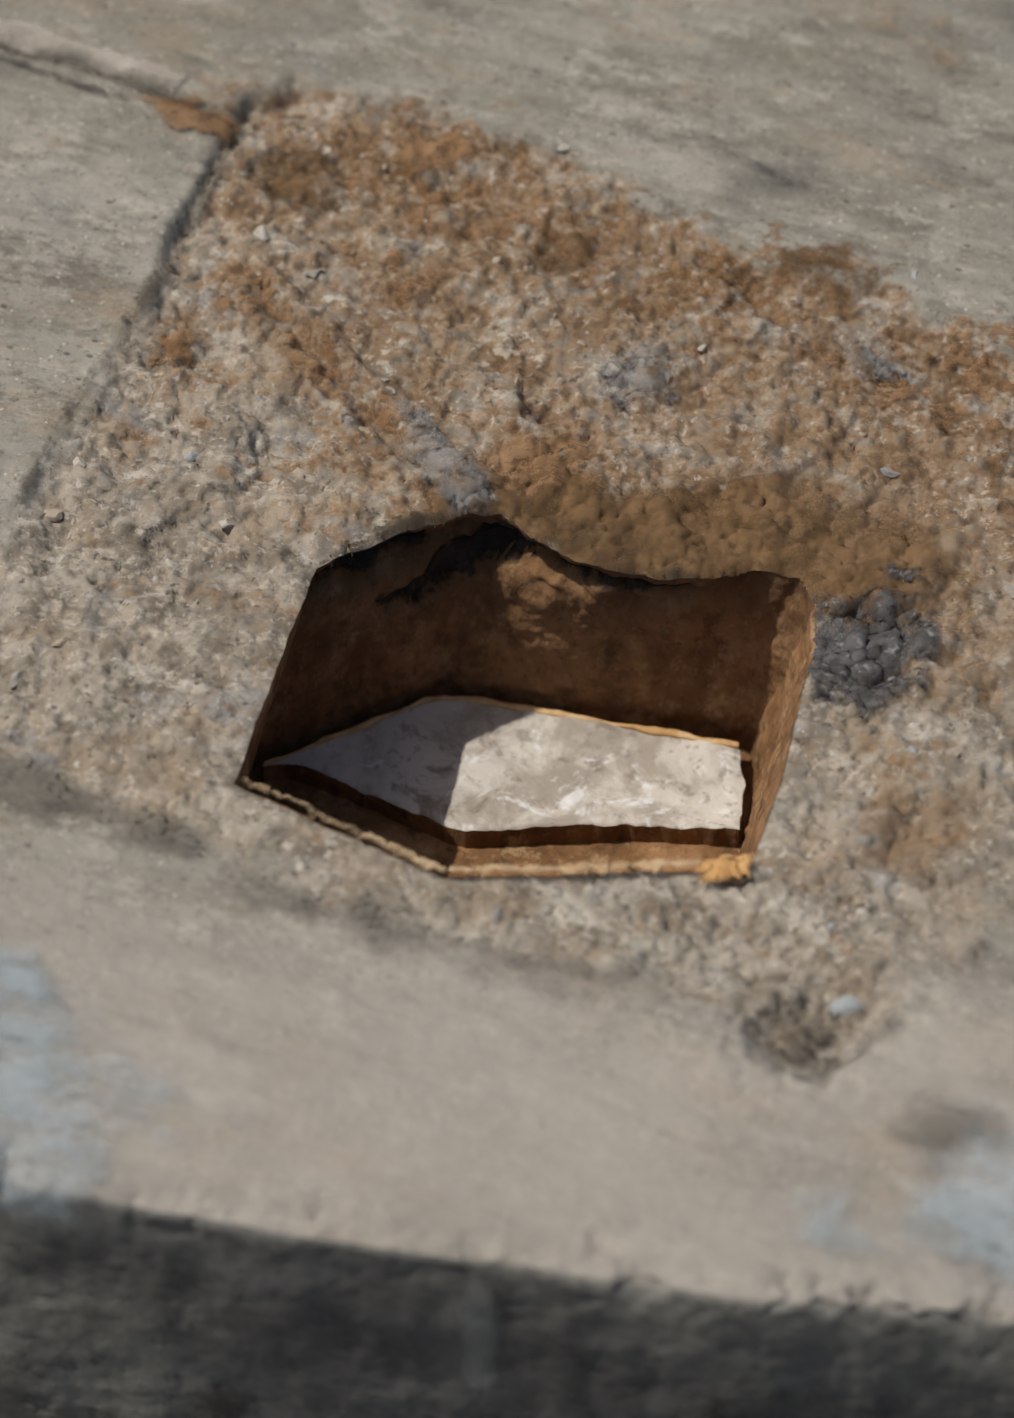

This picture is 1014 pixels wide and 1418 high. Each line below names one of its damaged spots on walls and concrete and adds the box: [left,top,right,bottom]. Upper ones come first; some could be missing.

corrosion [141,95,241,147]
spalling [0,84,1014,1080]